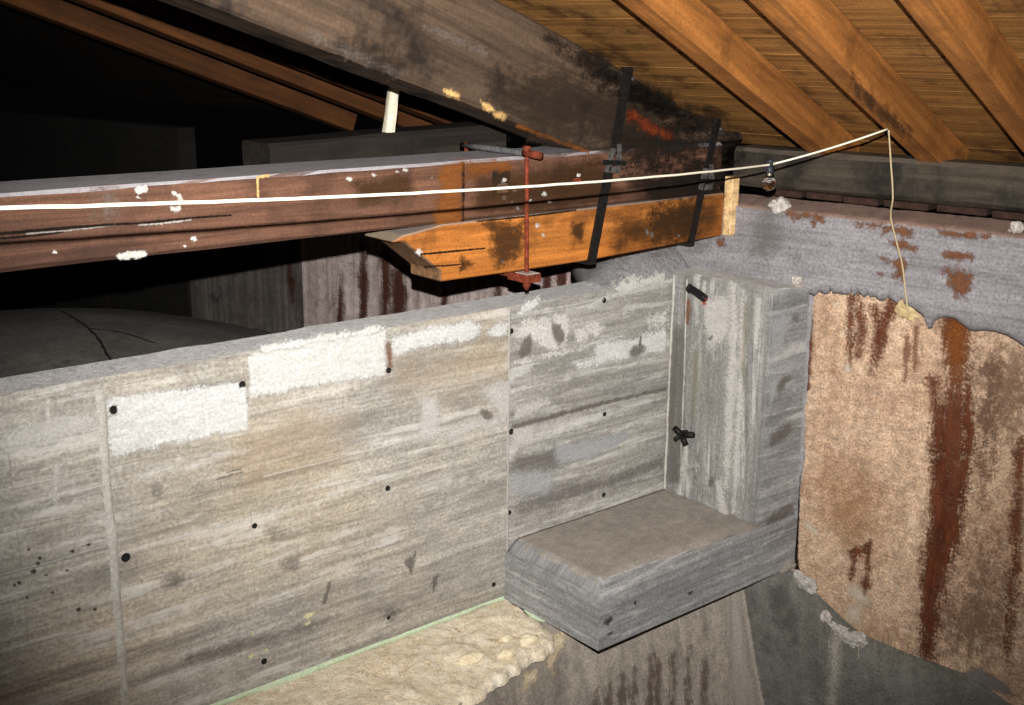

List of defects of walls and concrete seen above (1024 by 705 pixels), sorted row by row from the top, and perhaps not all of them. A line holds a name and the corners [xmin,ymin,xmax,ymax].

rust [785,211,825,228]
crack [61,311,156,360]
efflorescence [610,271,666,297]
rust [846,293,897,372]
rust [857,222,918,280]
spalling [894,300,919,322]
rust [941,251,974,299]
damp [0,295,670,458]
rust [917,318,976,663]
rust [849,540,872,595]
rust [1003,439,1024,662]
spalling [829,585,871,648]